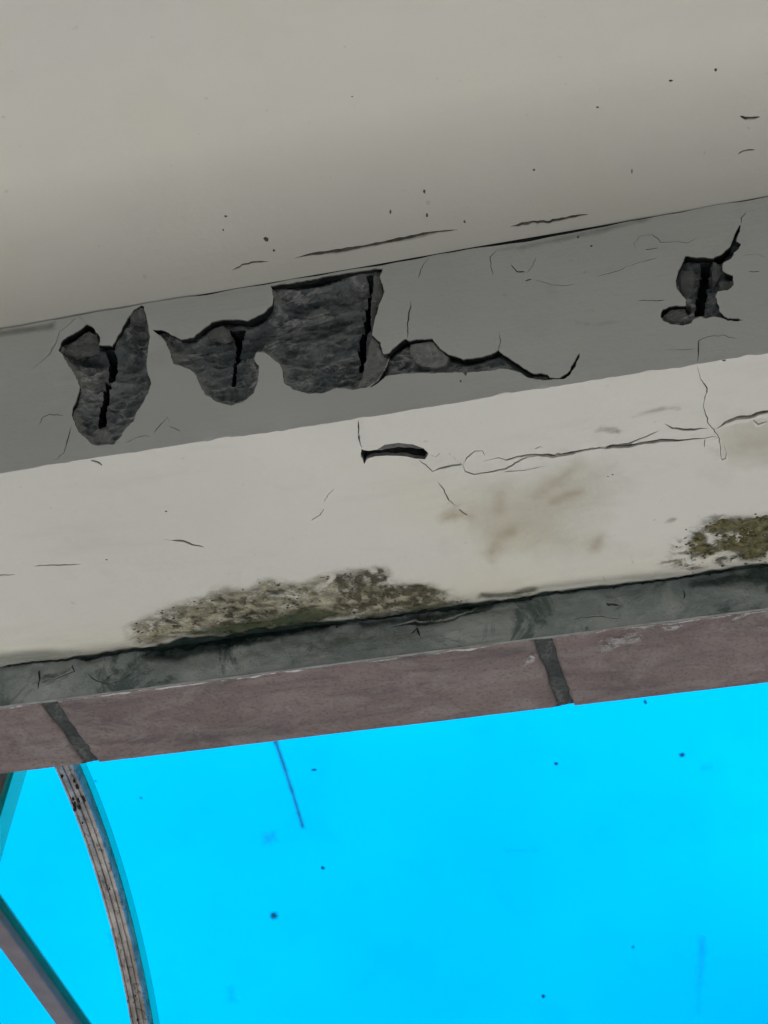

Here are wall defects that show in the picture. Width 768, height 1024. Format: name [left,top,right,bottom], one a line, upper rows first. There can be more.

crack [190,210,701,297]
spalling [661,225,741,326]
spalling [59,268,580,446]
spalling [361,443,428,464]
crack [419,334,768,516]
water stain [0,564,768,669]